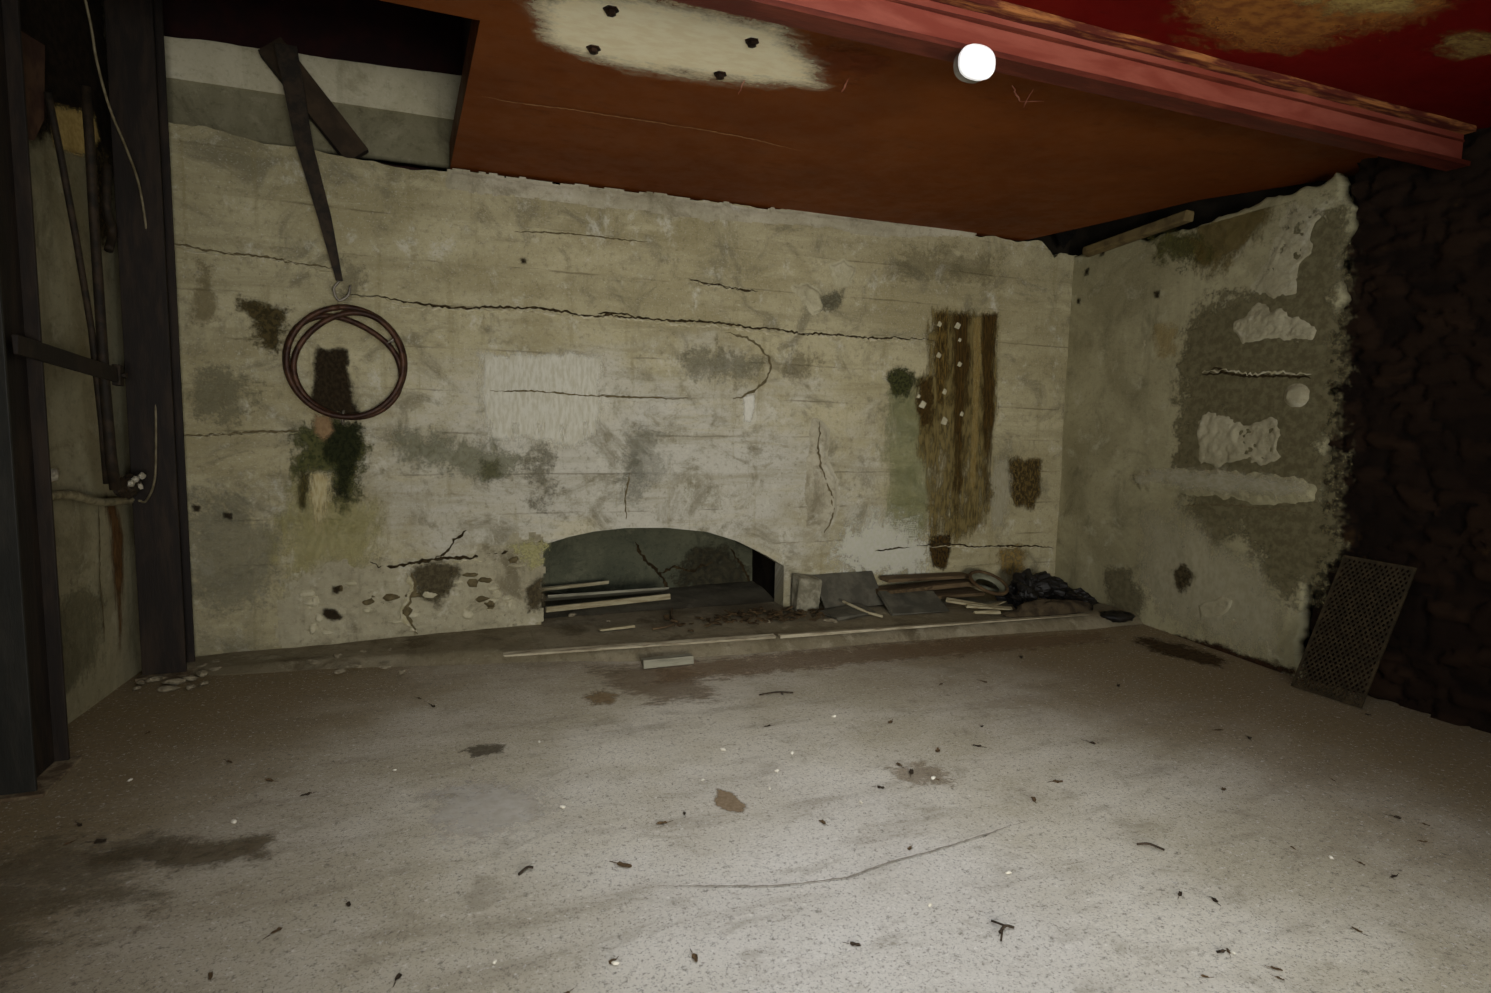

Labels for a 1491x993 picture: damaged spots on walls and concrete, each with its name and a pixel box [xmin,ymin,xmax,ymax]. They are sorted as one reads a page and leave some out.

peeling [534,0,820,86]
peeling [1171,0,1450,56]
peeling [1440,31,1491,59]
peeling [1233,202,1327,344]
crack [174,243,933,400]
crack [1202,367,1311,379]
water stain [314,415,333,439]
peeling [1197,412,1281,468]
water stain [298,472,331,524]
water stain [1009,457,1042,510]
crack [367,530,544,635]
spalling [1174,563,1193,592]